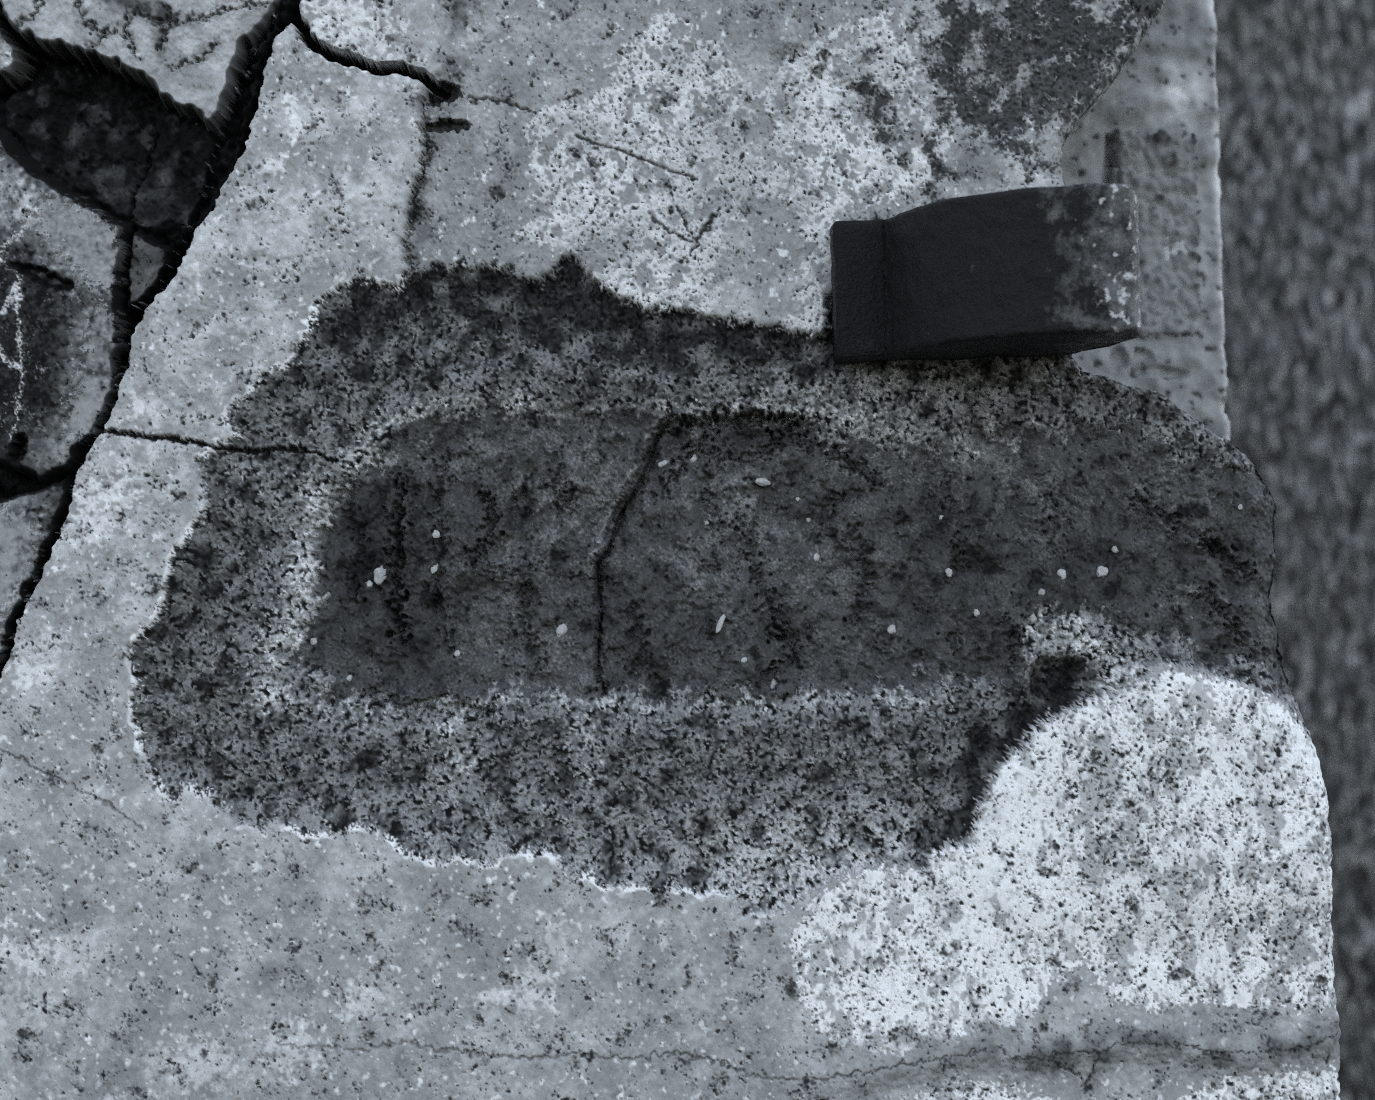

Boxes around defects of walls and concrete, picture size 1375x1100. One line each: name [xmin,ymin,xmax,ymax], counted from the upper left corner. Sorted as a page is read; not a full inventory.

crack [16,0,537,370]
crack [102,409,338,462]
crack [0,749,145,832]
crack [275,1030,1341,1086]